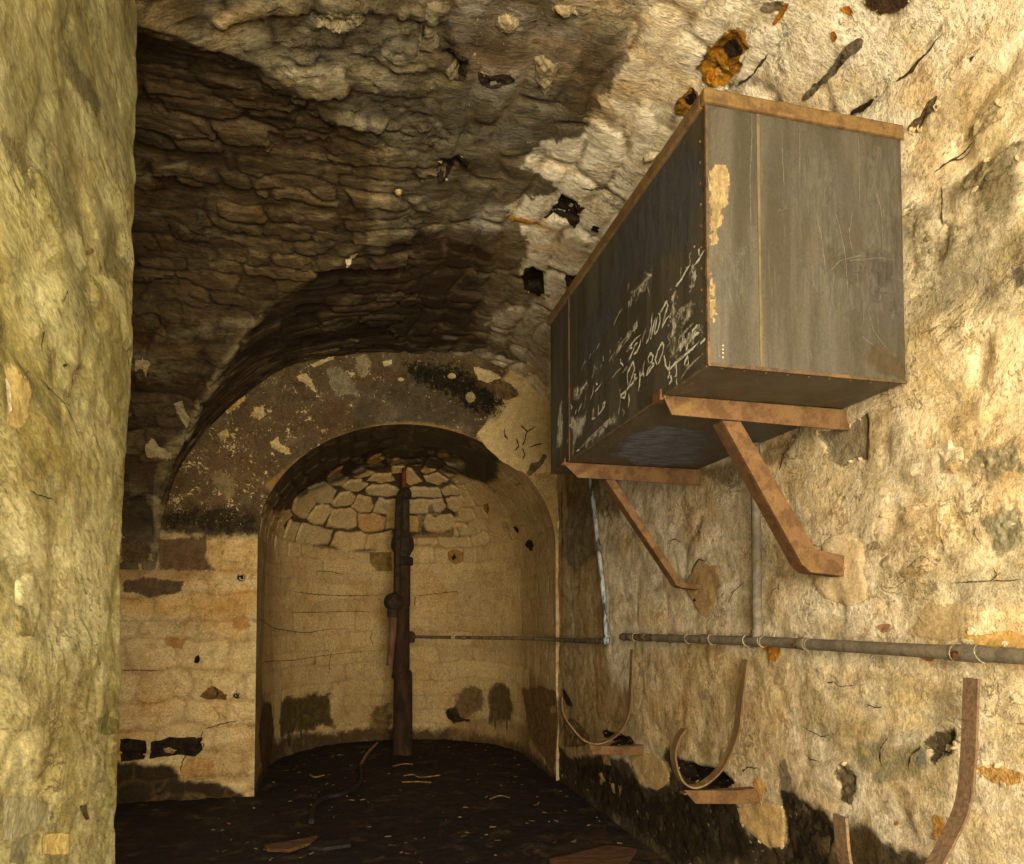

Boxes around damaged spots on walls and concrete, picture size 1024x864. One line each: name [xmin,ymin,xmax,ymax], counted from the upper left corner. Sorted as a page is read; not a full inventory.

spalling [442,48,515,89]
crack [896,34,942,82]
spalling [437,155,470,183]
spalling [544,194,585,229]
spalling [522,266,545,296]
leakage [397,358,506,418]
crack [491,426,543,497]
leakage [121,503,260,598]
leakage [258,693,336,773]
leakage [445,683,559,775]
spalling [924,729,957,766]
spalling [834,762,856,805]